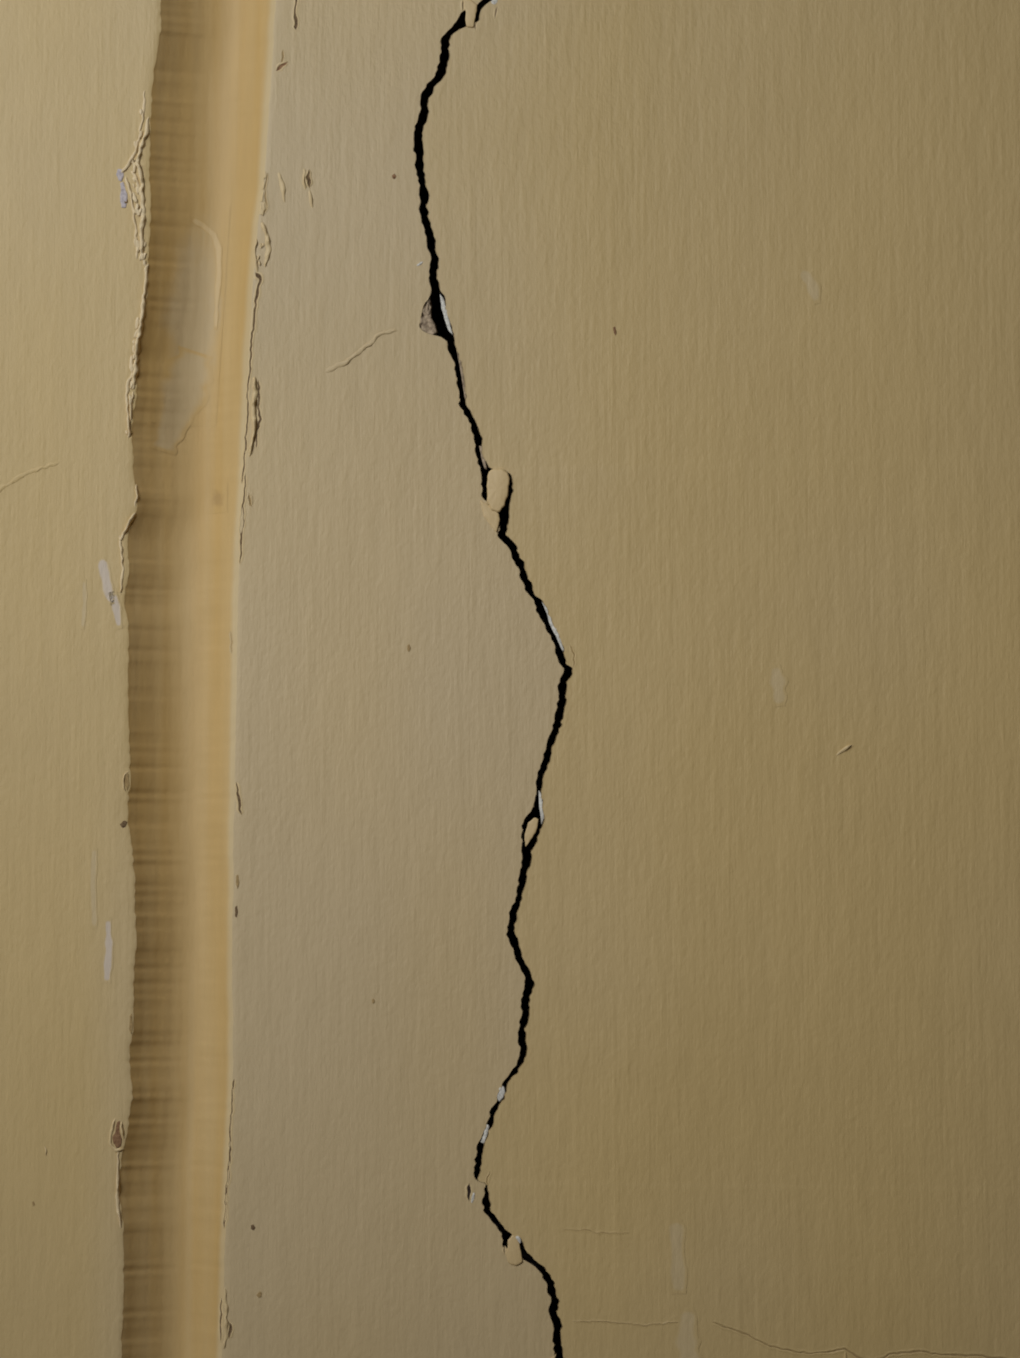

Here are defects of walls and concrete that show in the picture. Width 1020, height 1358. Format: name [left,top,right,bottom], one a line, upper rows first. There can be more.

peeling [116,90,149,438]
crack [413,0,678,1358]